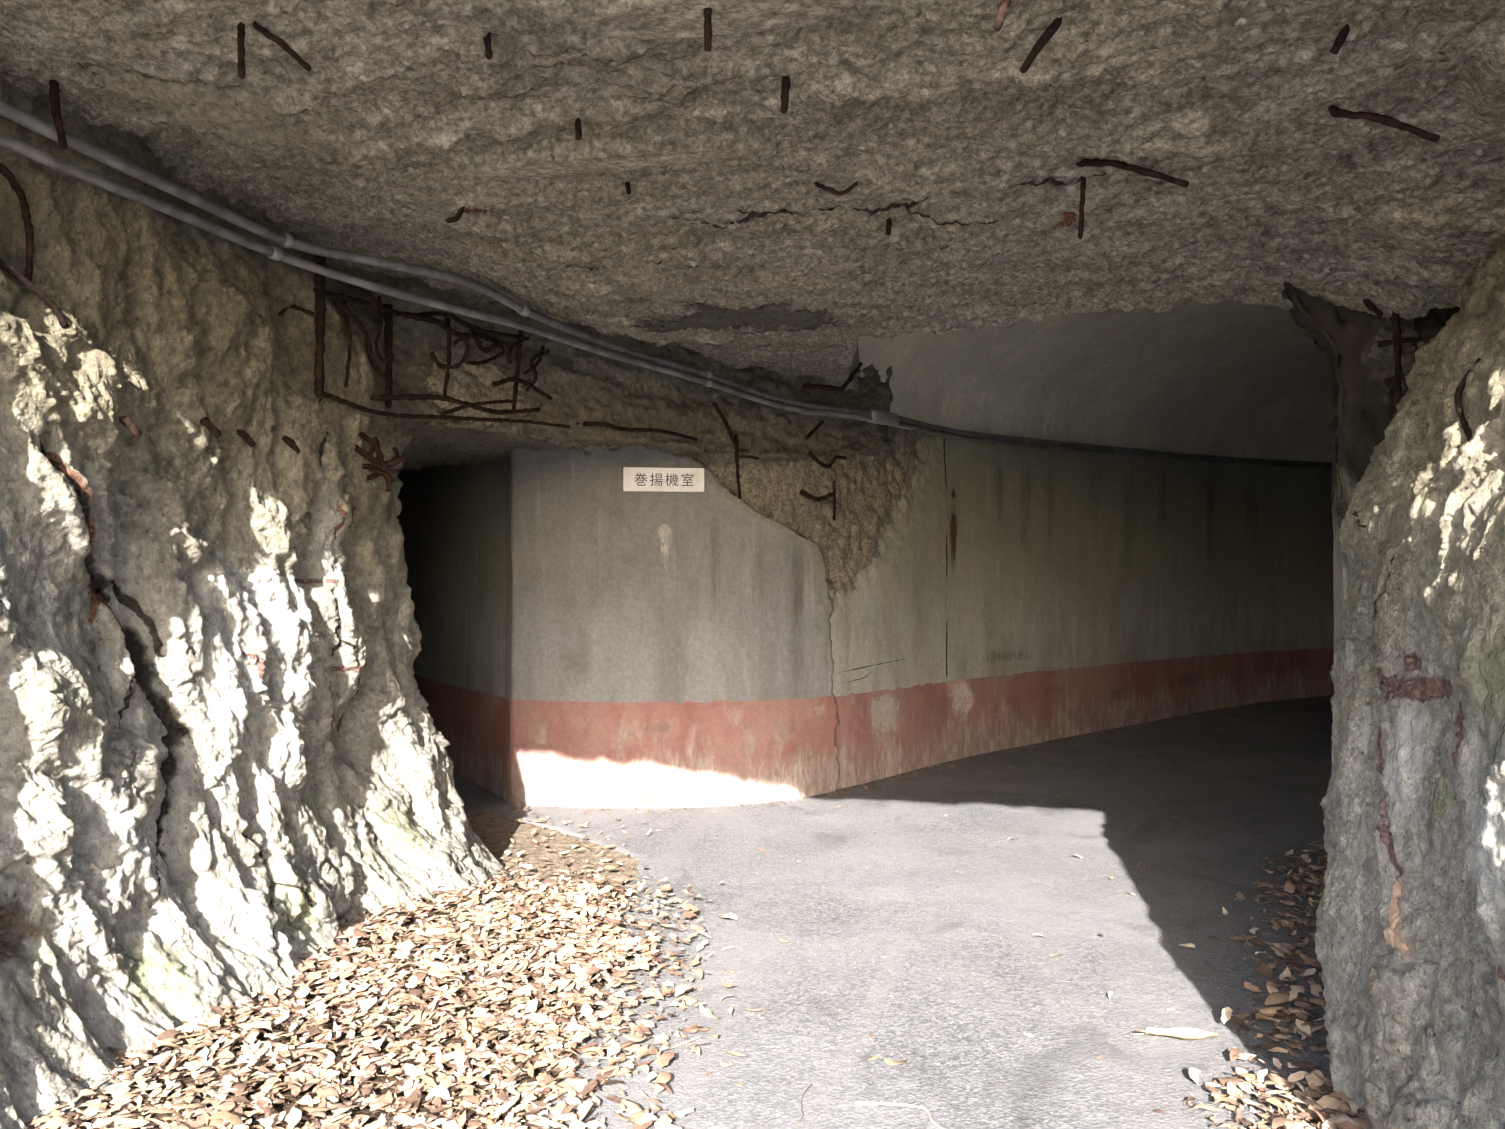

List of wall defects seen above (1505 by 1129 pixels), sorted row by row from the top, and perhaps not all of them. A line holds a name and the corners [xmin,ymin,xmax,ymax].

rust [237,21,311,79]
rust [703,7,713,52]
rust [1020,17,1062,73]
rust [1328,105,1440,143]
rust [1058,158,1189,239]
spalling [418,342,621,455]
spalling [631,301,840,334]
spalling [1363,299,1451,416]
rust [1454,358,1481,442]
spalling [693,426,919,595]
crack [40,443,193,909]
rust [1376,653,1464,950]